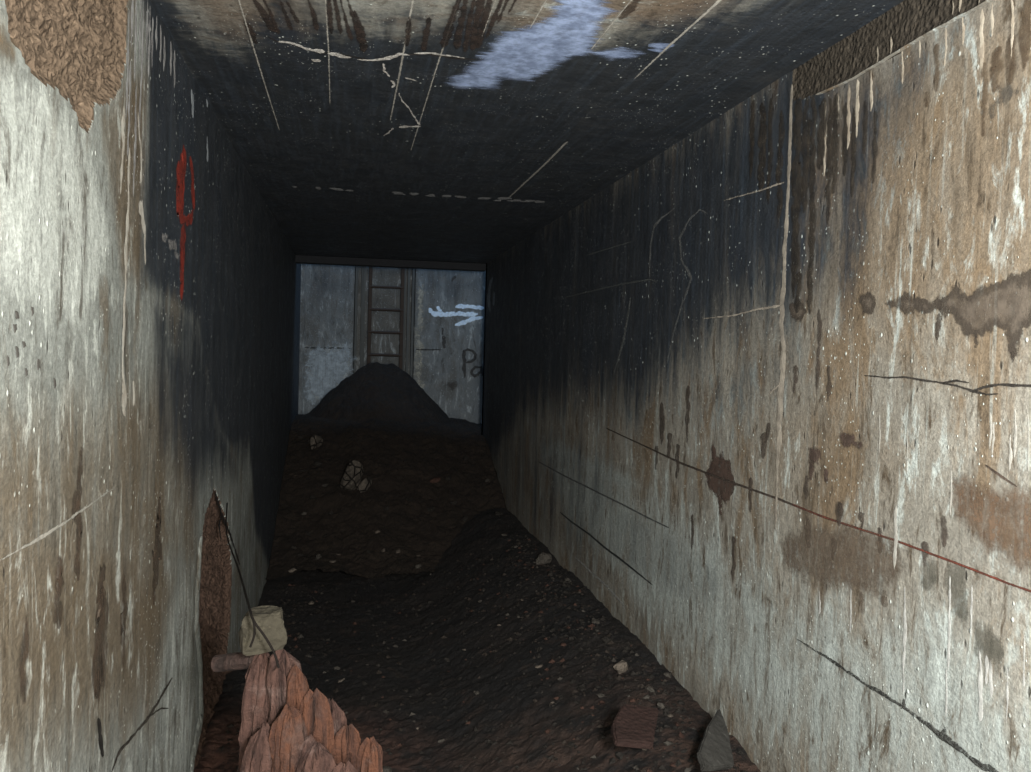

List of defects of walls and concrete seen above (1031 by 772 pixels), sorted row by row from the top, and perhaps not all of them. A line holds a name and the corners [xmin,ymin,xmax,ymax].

spalling [0,0,130,144]
spalling [788,0,1007,108]
leakage [978,0,1031,136]
leakage [704,39,904,527]
leakage [859,269,1031,361]
leakage [655,386,691,478]
crack [864,375,1031,395]
spalling [189,482,233,772]
leakage [783,502,898,632]
leakage [921,541,1009,721]
leakage [941,471,1031,565]
crack [797,639,998,772]